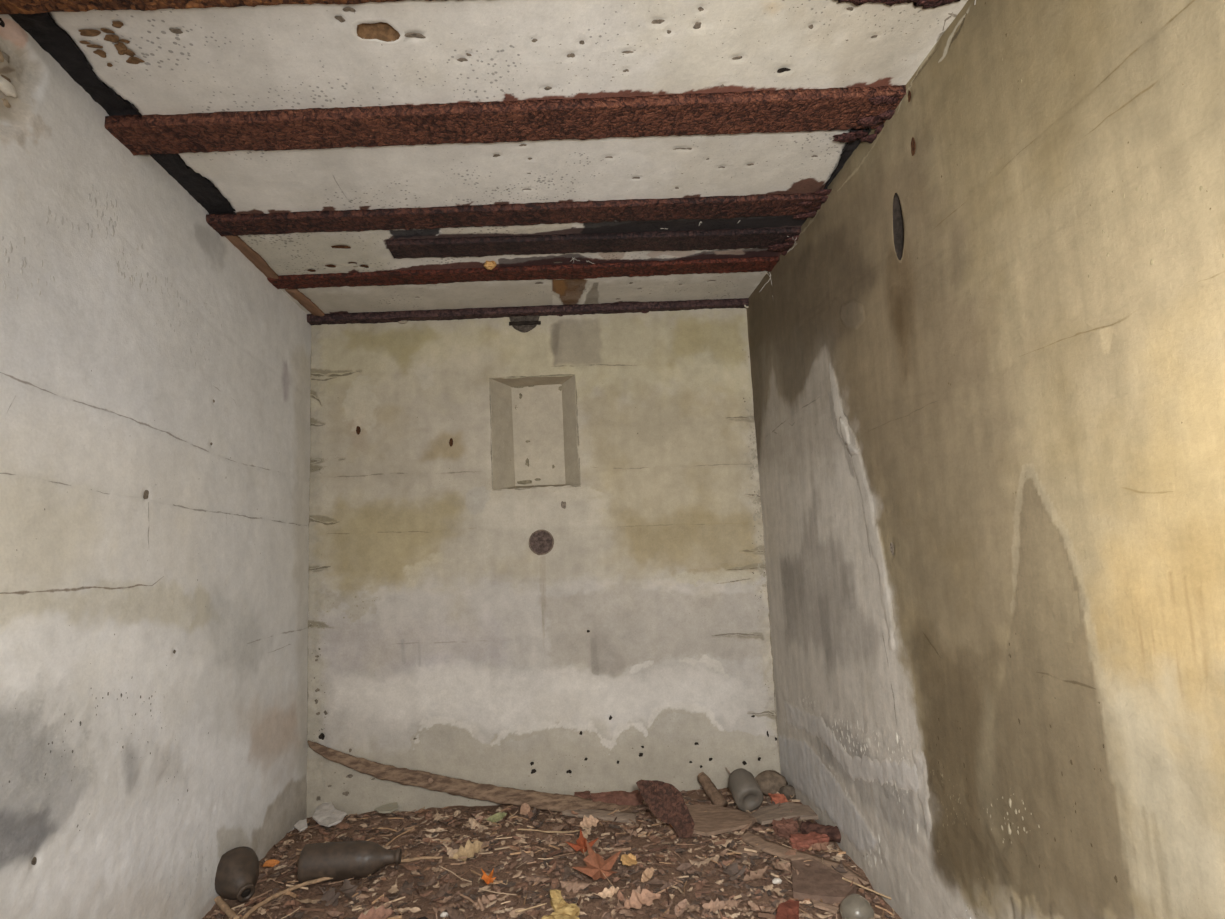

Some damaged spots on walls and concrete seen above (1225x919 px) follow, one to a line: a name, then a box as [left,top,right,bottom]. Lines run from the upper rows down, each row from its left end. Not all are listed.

spalling [0,14,60,169]
rust [298,82,827,109]
rust [842,74,900,88]
rust [739,176,830,196]
rust [380,225,582,250]
crack [0,351,497,754]
damp [212,201,1225,919]
damp [0,557,277,700]
damp [115,722,192,808]
damp [0,810,78,919]
damp [176,887,221,919]